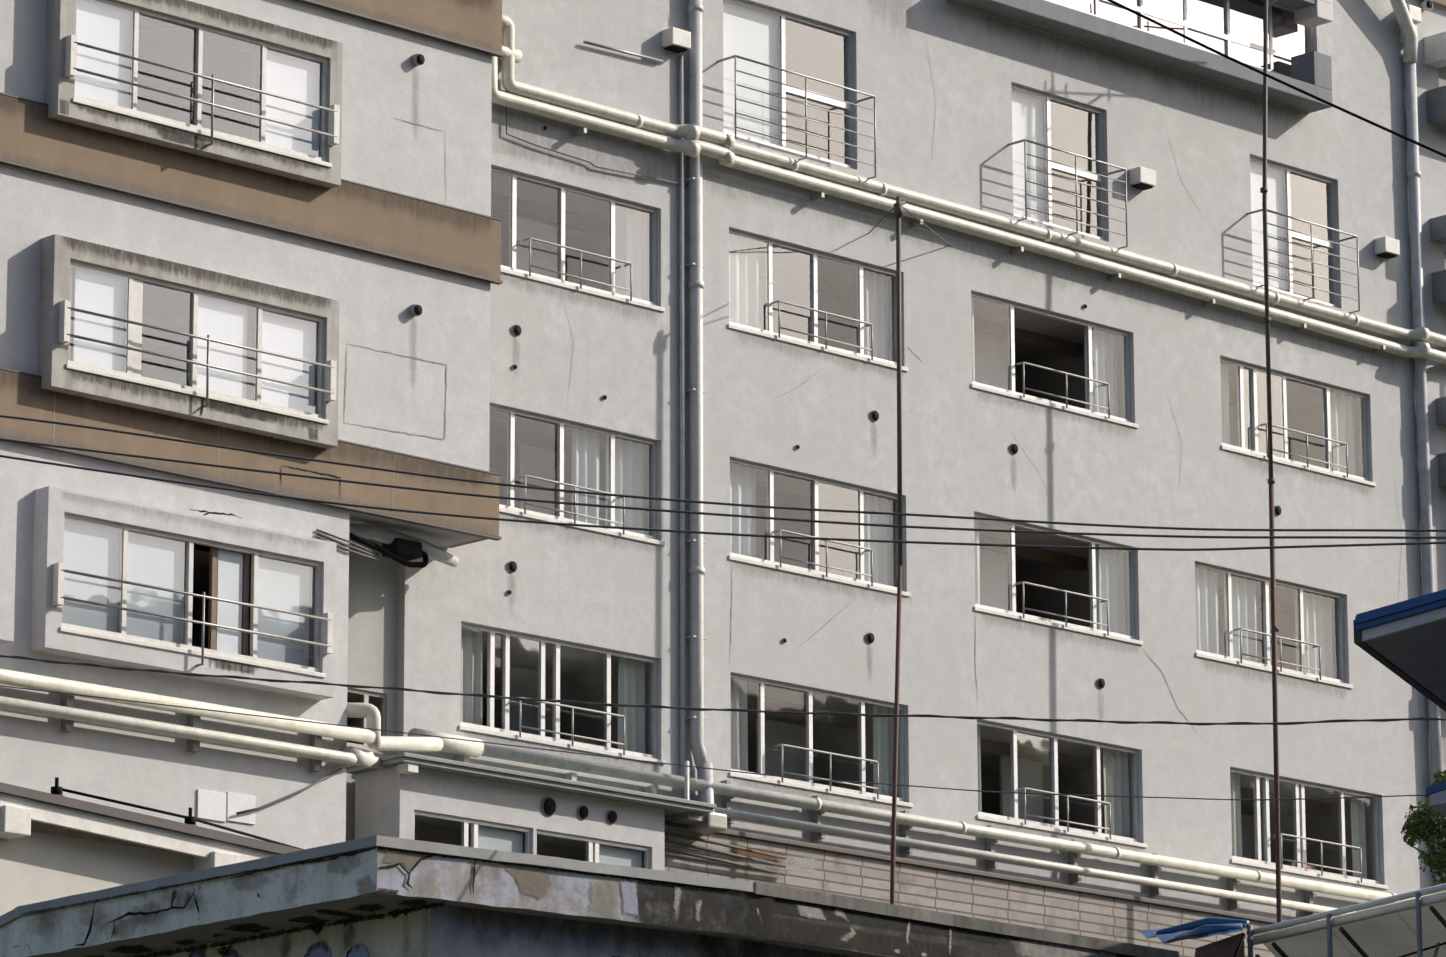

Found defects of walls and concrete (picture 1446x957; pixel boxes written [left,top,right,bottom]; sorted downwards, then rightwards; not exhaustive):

crack [1143,650,1201,736]
spalling [94,888,445,957]
crack [74,850,475,946]
water stain [21,846,1013,957]
peeling [505,864,561,899]